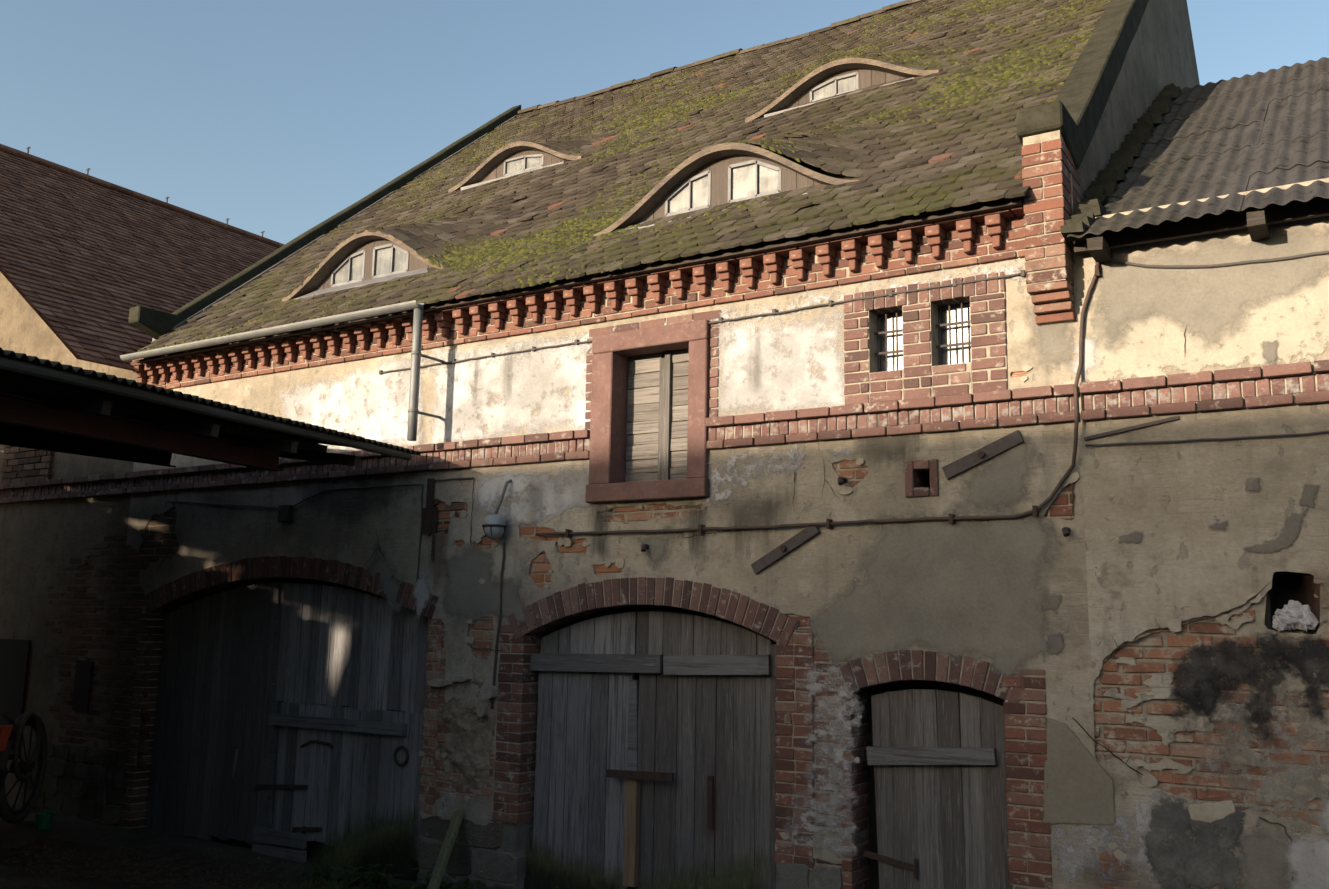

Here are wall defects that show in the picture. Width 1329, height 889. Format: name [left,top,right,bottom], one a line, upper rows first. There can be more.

flaking render [129,507,179,585]
peeling [430,443,807,589]
flaking render [832,449,868,495]
flaking render [1044,472,1080,520]
peeling [779,613,861,865]
flaking render [1051,572,1329,888]
damp [1244,674,1274,739]
damp [1305,683,1323,718]